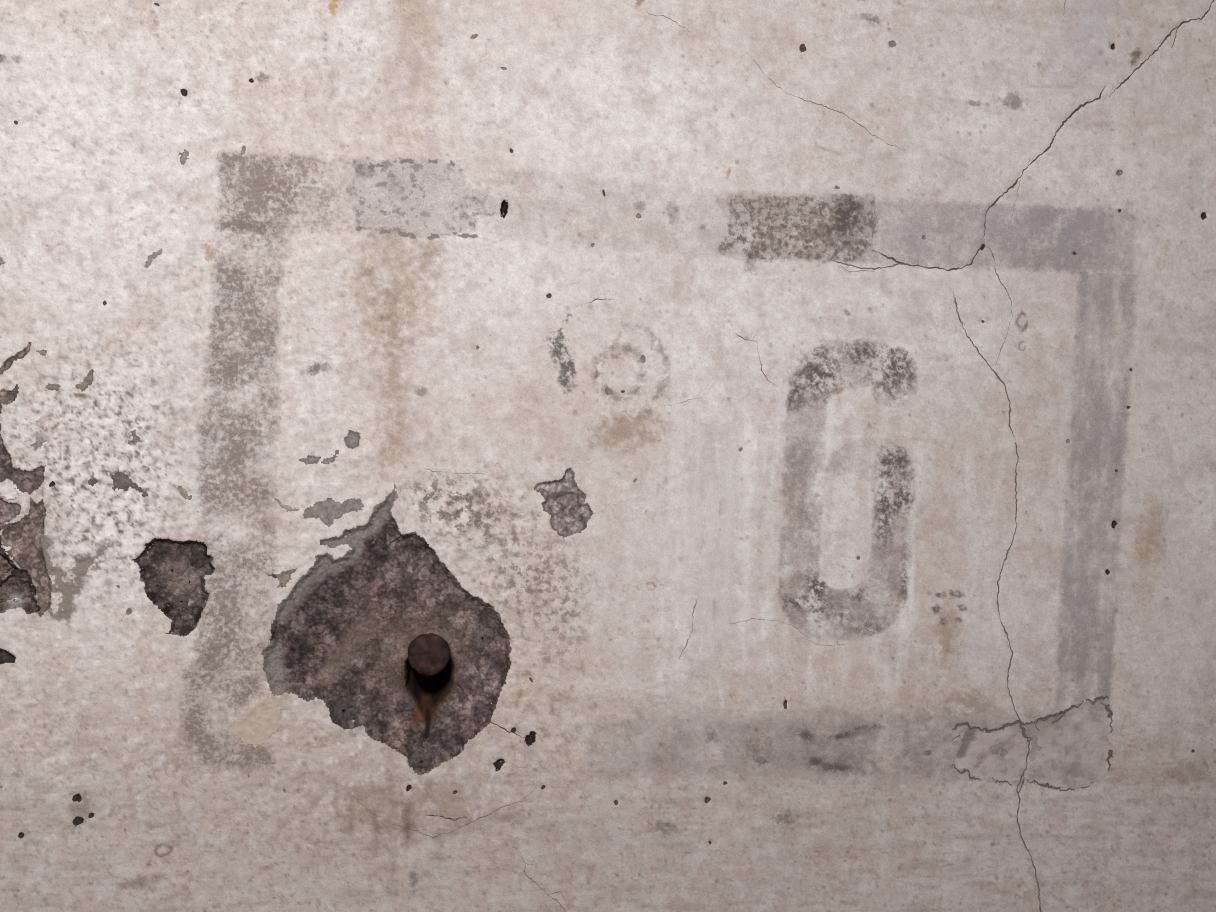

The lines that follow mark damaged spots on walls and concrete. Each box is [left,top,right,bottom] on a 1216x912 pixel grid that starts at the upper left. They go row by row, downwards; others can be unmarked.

crack [750,57,896,146]
peeling [0,342,113,621]
spalling [534,468,593,538]
crack [872,0,1214,912]
spalling [0,648,16,664]
spalling [131,538,215,637]
spalling [223,482,512,791]
peeling [951,696,1113,791]